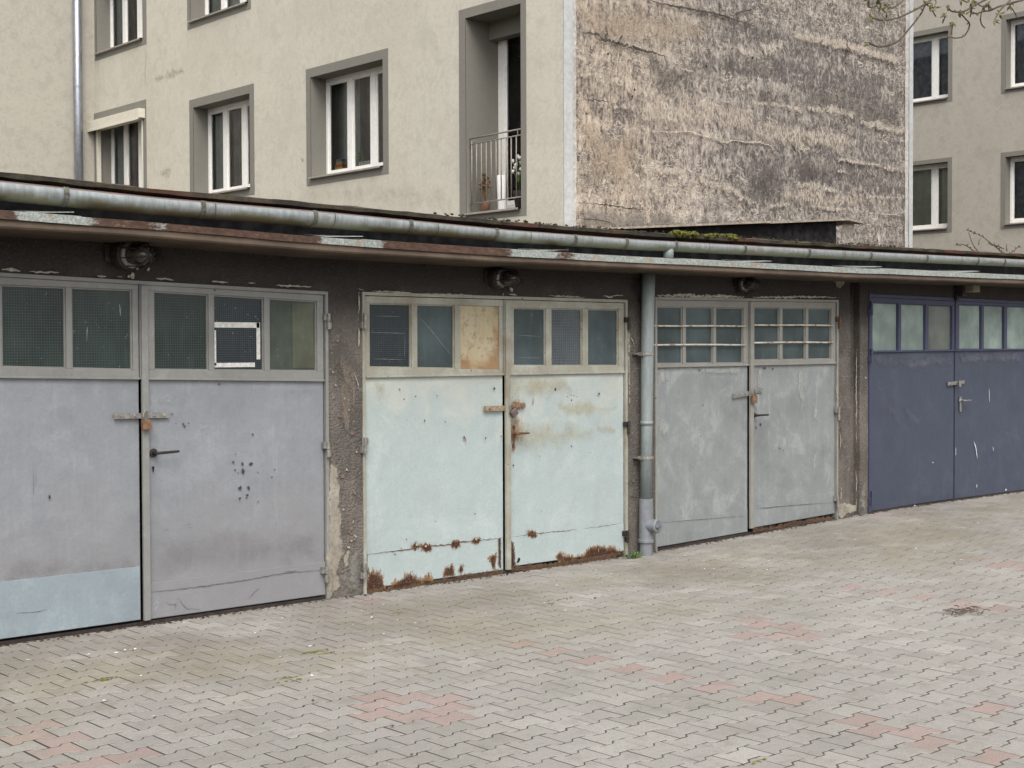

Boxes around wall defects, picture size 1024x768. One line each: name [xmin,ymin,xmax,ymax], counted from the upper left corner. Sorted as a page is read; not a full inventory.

corrosion [511,400,525,452]
peeling [326,465,356,597]
corrosion [367,538,622,594]